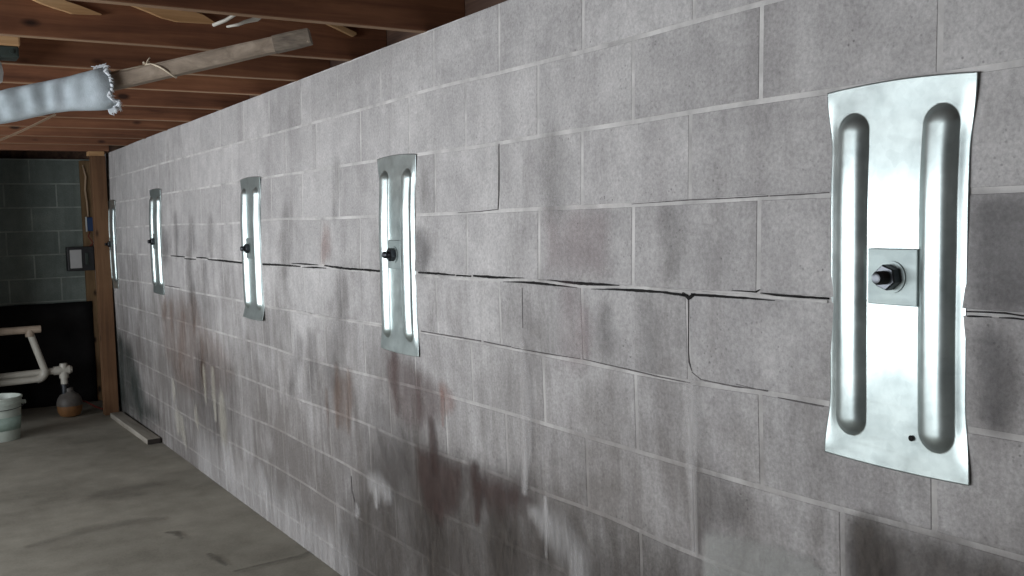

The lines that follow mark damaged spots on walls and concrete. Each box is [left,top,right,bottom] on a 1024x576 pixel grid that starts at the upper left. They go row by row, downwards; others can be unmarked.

crack [170,255,380,272]
crack [418,272,829,407]
crack [966,311,1024,320]
water stain [419,421,519,576]